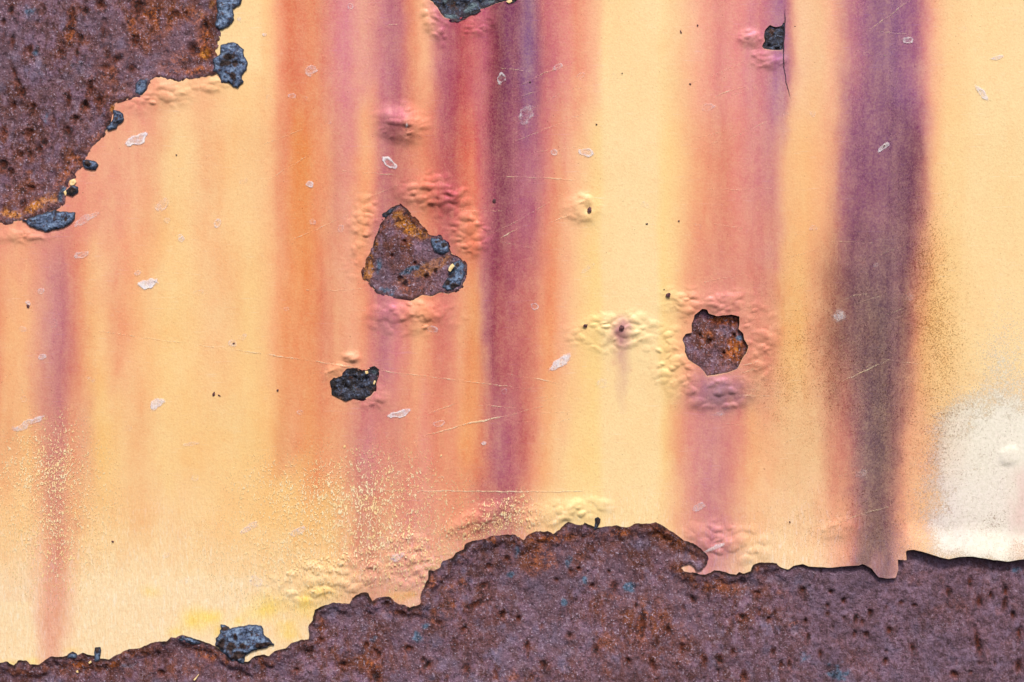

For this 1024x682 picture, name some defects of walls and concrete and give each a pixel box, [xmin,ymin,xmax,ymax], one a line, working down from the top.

peeling [0,0,248,232]
peeling [330,366,379,401]
peeling [361,204,467,301]
peeling [430,0,516,22]
corrosion [490,1,522,369]
peeling [683,309,748,376]
peeling [762,22,796,50]
corrosion [837,107,922,564]
peeling [0,411,118,593]
peeling [0,445,1024,682]